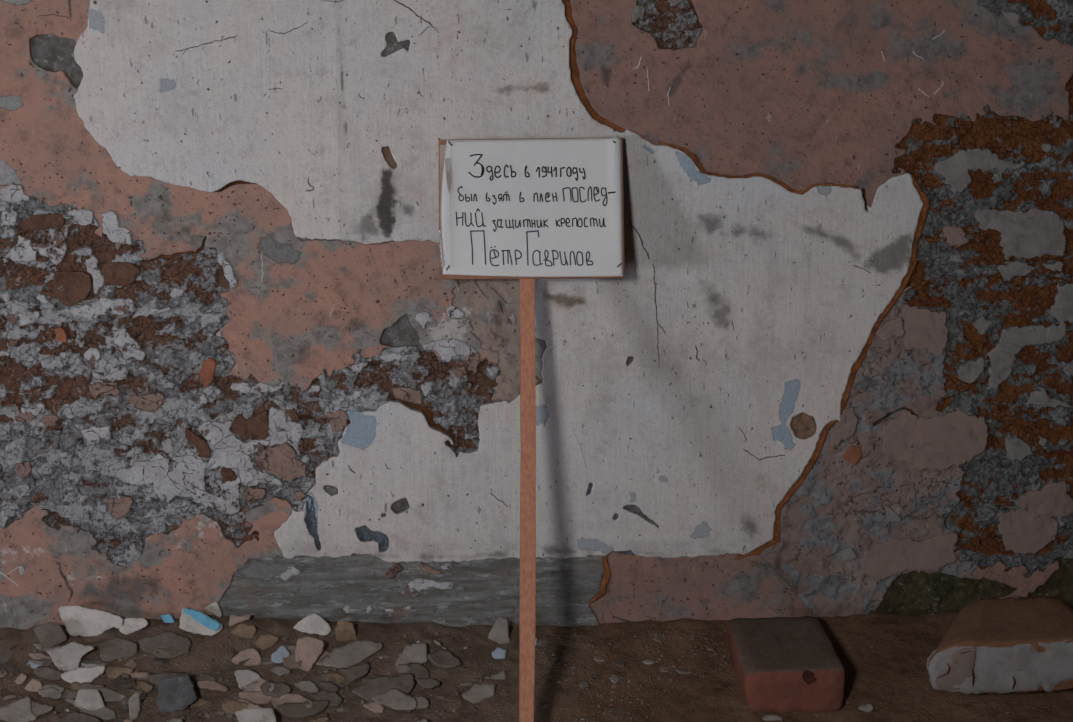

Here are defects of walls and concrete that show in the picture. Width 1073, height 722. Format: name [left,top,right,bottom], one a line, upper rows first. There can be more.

crack [175,35,238,55]
spalling [0,0,520,722]
crack [394,0,439,35]
spalling [535,0,1073,646]